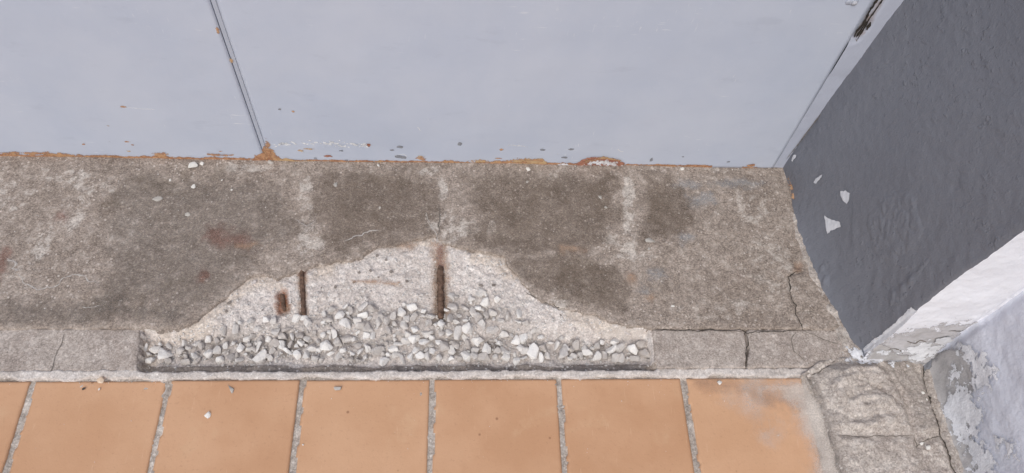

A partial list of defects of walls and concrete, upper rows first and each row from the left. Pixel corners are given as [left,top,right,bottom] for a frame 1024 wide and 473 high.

rust [0,141,577,165]
rust [274,272,306,314]
spalling [137,238,657,373]
damp [469,171,629,312]
crack [655,271,837,376]
peeling [824,215,841,234]
crack [838,330,964,473]
peeling [863,307,1020,473]